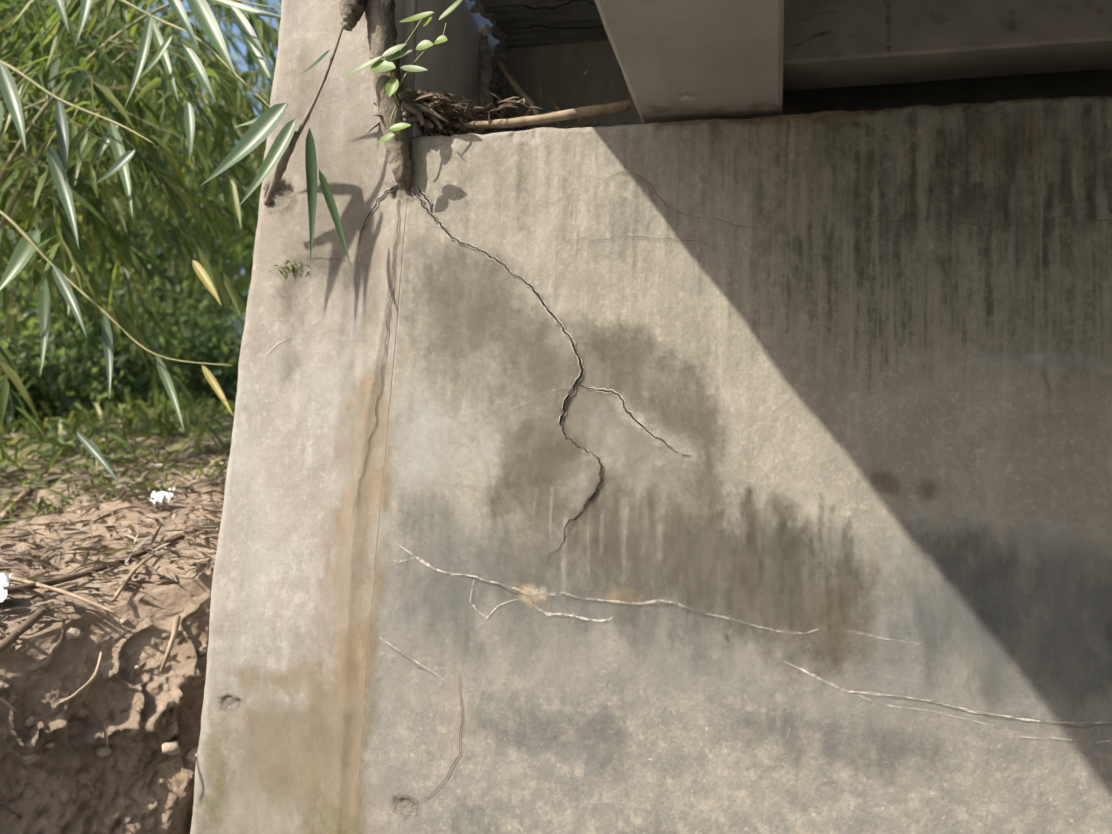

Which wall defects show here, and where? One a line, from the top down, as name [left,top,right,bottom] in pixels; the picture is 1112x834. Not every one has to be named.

crack [305,187,691,564]
crack [390,546,819,634]
damp [565,493,863,661]
crack [848,691,1112,743]